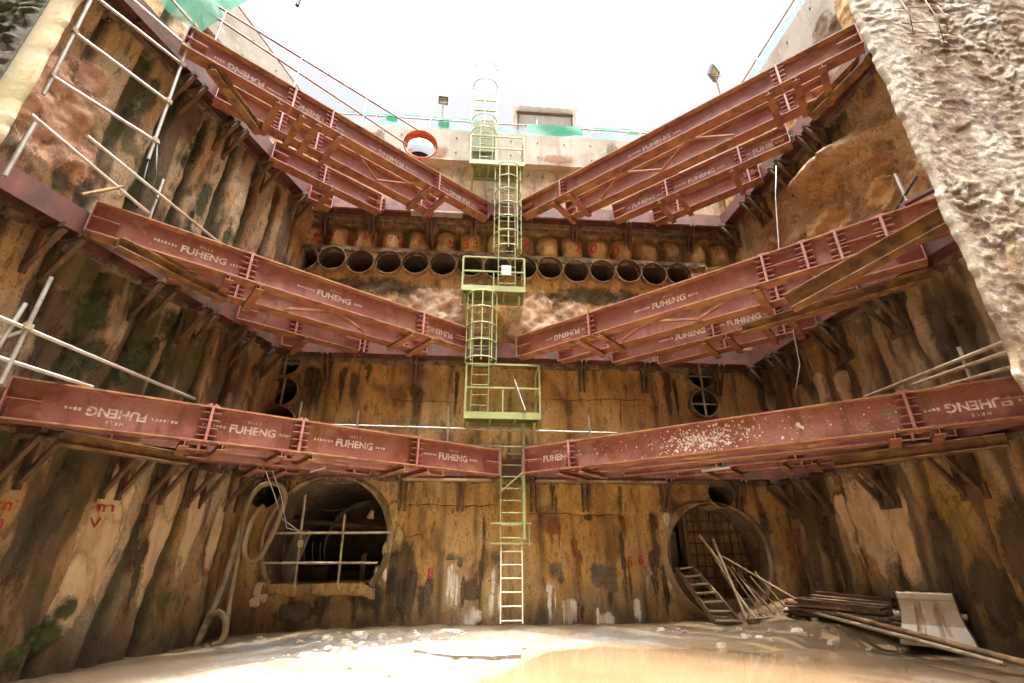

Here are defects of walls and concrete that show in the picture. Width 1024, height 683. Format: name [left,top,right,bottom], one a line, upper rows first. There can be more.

water stain [304,366,322,410]
water stain [338,368,360,403]
water stain [410,383,423,422]
water stain [351,539,434,622]
water stain [446,517,500,625]
water stain [546,497,677,625]